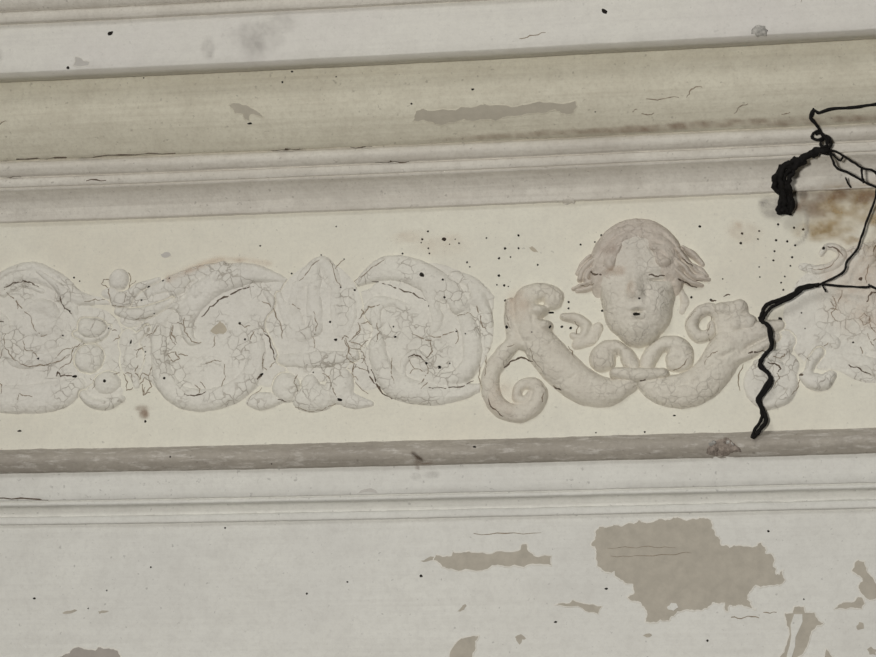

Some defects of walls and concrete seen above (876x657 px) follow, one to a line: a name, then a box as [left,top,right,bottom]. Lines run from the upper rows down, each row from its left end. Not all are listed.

peeling [413,100,578,126]
crack [0,280,95,389]
crack [60,273,336,412]
crack [299,259,561,417]
peeling [422,542,552,573]
peeling [590,516,786,637]
peeling [834,559,876,611]
peeling [57,646,122,657]
peeling [448,635,480,657]
peeling [778,605,825,657]